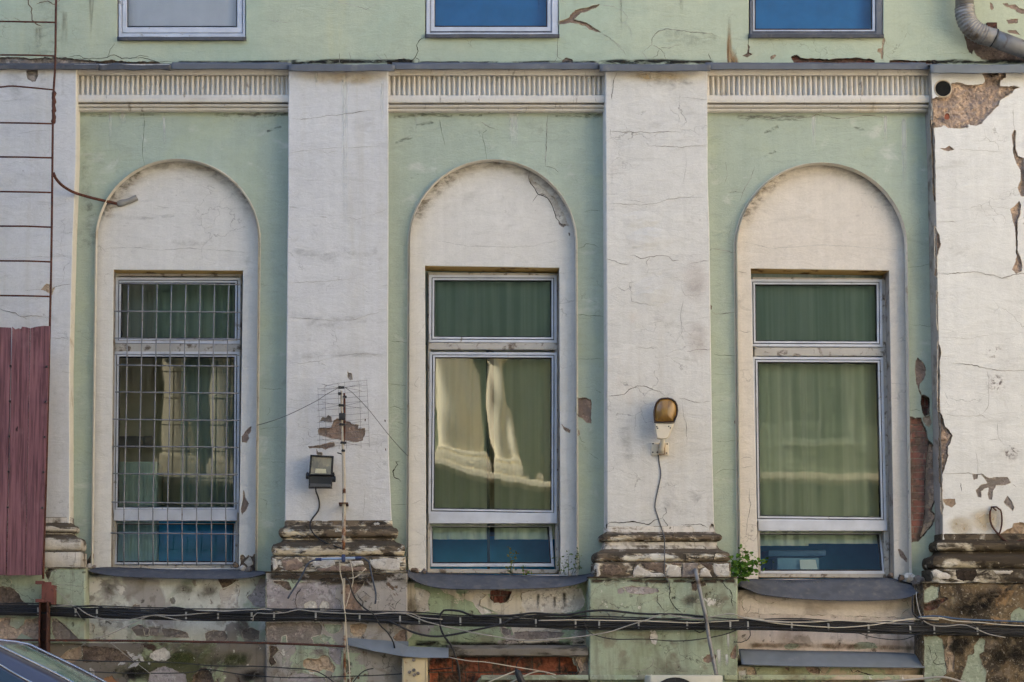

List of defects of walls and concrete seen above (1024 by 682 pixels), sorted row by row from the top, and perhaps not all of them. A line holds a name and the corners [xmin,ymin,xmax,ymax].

flaking render [791,38,937,64]
crack [433,117,562,248]
crack [585,131,704,212]
spalling [930,73,1019,201]
spalling [1010,130,1024,274]
crack [606,440,753,531]
flaking render [898,290,956,562]
crack [910,335,1024,491]
spalling [972,473,1024,536]
spalling [218,554,400,682]
flaking render [429,656,588,682]
spalling [923,635,987,682]